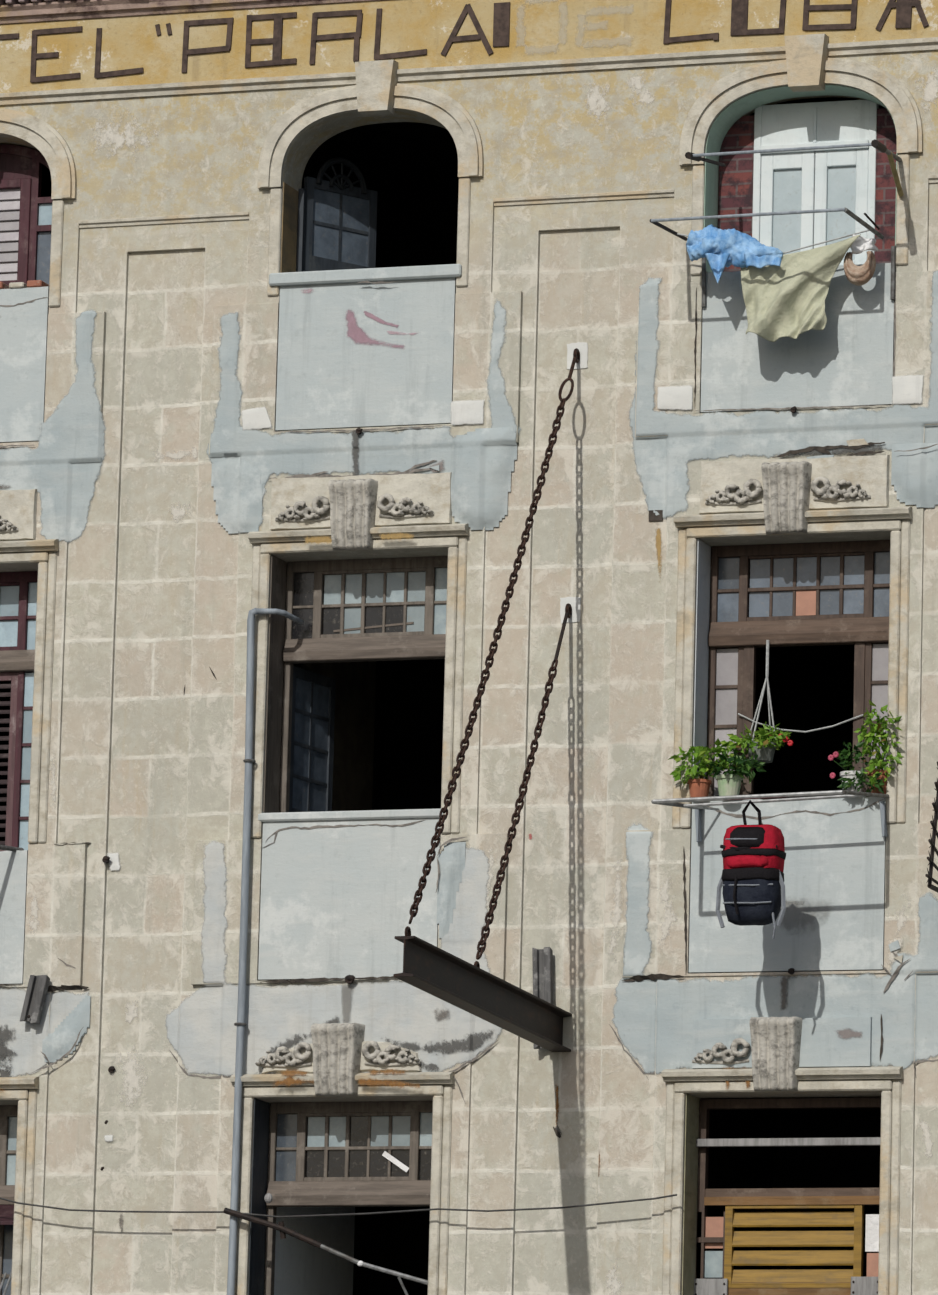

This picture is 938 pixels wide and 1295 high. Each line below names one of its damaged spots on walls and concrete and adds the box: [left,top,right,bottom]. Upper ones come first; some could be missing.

flaking render [718,115,755,237]
crack [0,297,48,307]
flaking render [787,439,882,459]
flaking render [838,1029,862,1039]
leakage [0,1025,16,1077]